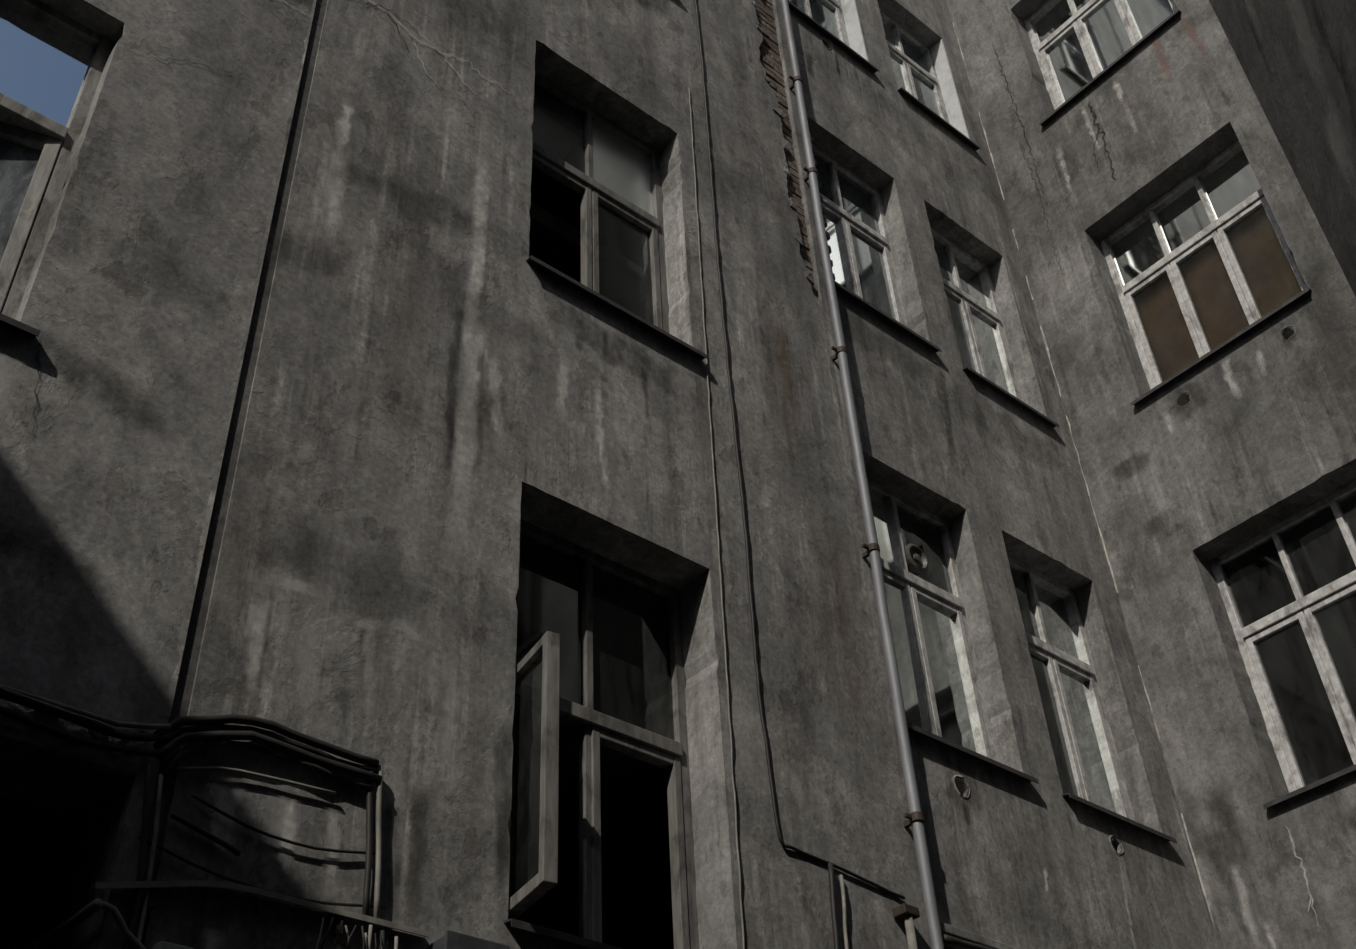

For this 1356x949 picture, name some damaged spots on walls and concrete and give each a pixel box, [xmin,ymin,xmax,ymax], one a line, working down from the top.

leakage [333,105,353,165]
leakage [468,167,489,294]
spalling [751,0,818,298]
spalling [808,124,835,280]
crack [953,22,1118,593]
crack [28,340,41,430]
leakage [446,310,502,490]
crack [1138,665,1161,743]
crack [1181,813,1208,904]